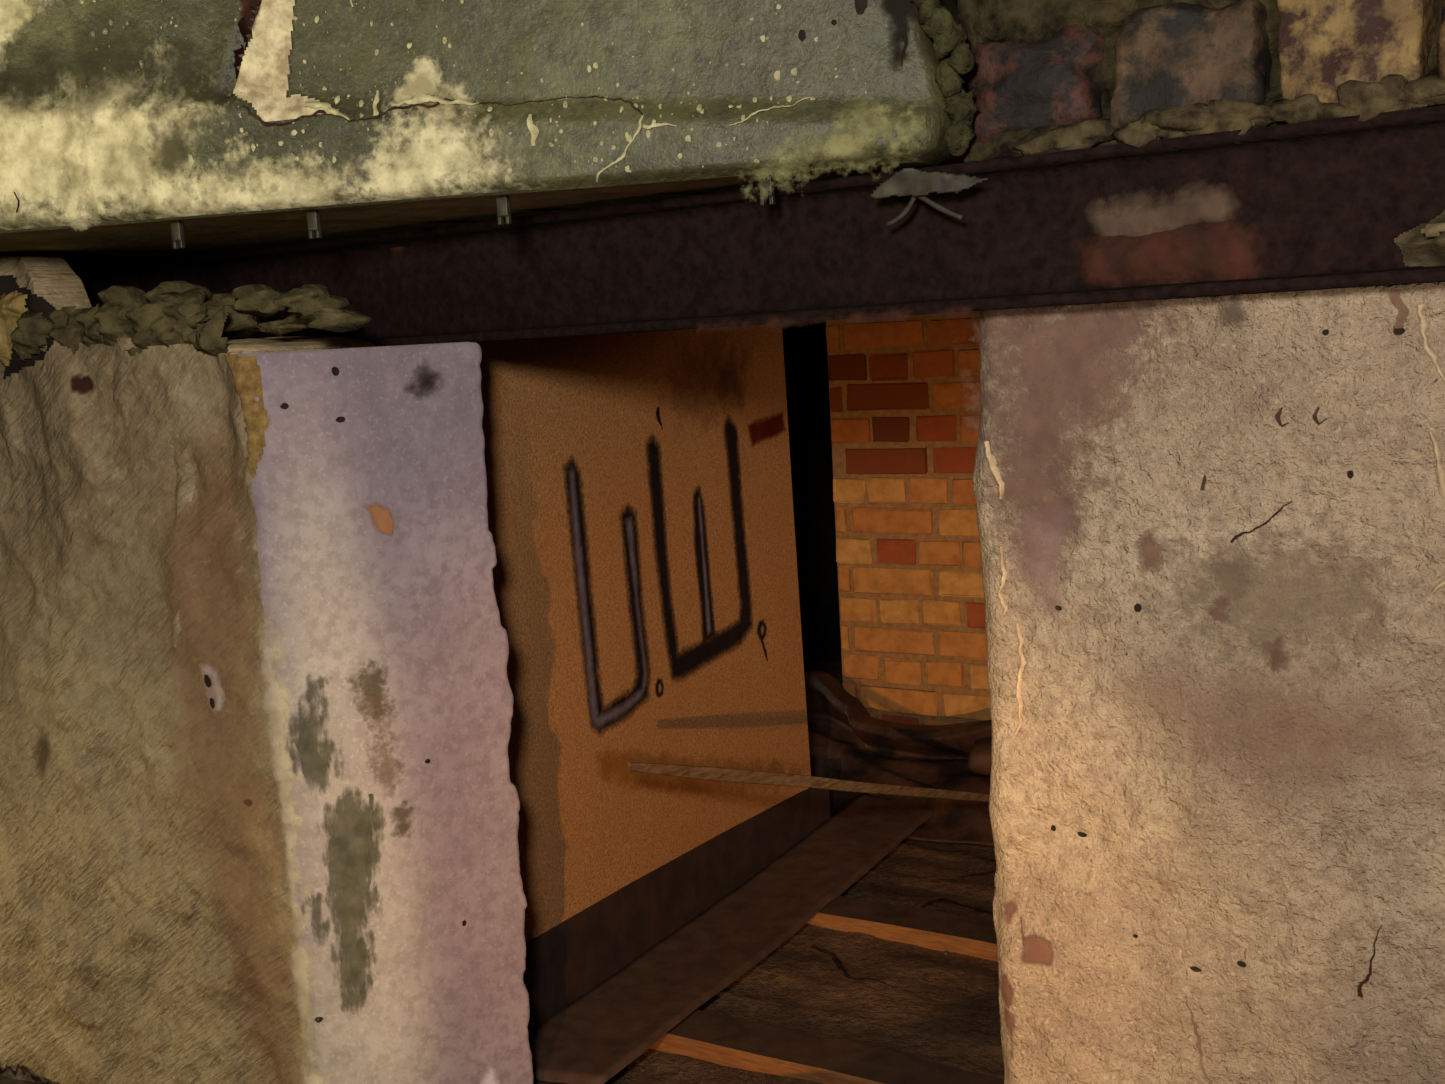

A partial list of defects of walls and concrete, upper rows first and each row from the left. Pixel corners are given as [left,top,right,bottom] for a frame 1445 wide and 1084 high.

peeling [0,0,42,72]
spalling [233,0,331,122]
crack [227,0,676,183]
peeling [0,58,531,230]
rust [1073,190,1264,287]
rust [698,310,911,331]
crack [1230,501,1292,543]
water stain [287,661,412,1010]
peeling [1005,902,1053,965]
crack [1357,925,1382,998]
peeling [1001,976,1014,1055]